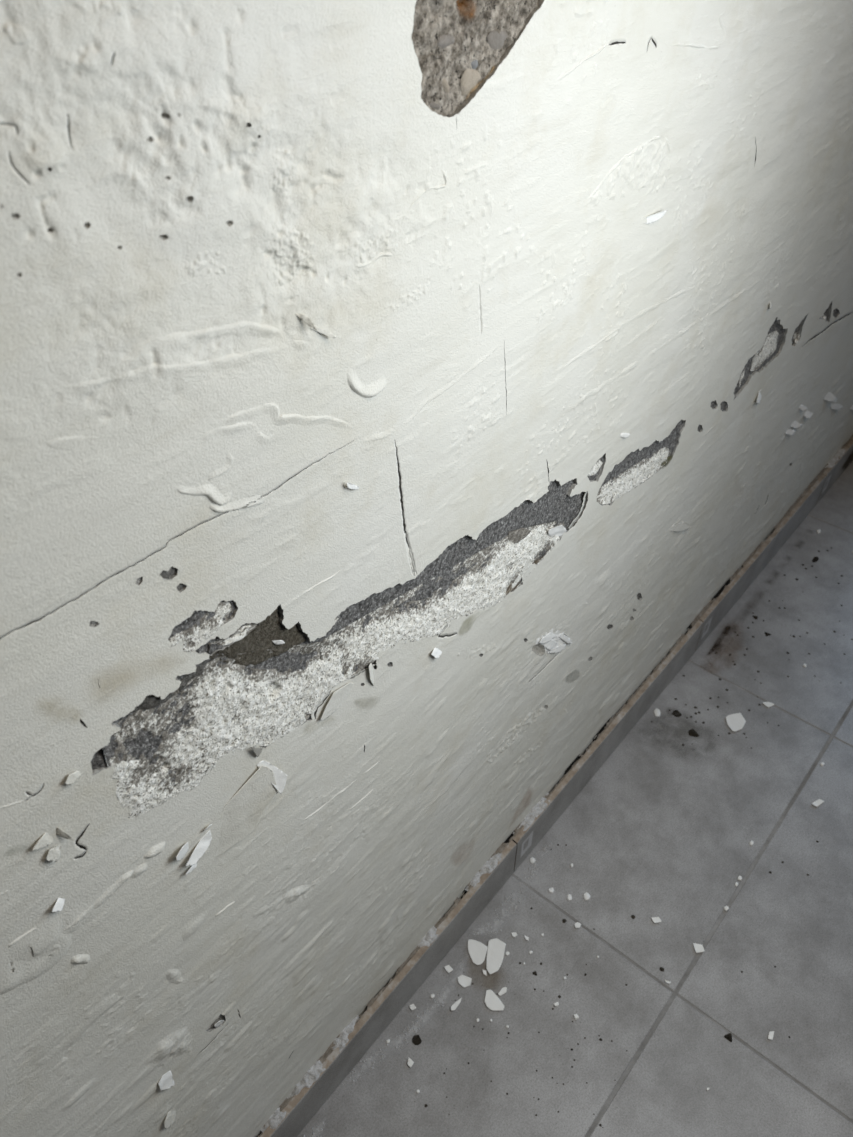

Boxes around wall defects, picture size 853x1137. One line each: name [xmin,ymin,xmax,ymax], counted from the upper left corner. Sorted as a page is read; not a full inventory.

spalling [411,0,544,117]
spalling [710,301,840,412]
crack [0,440,354,641]
crack [394,440,417,576]
spalling [65,420,703,819]